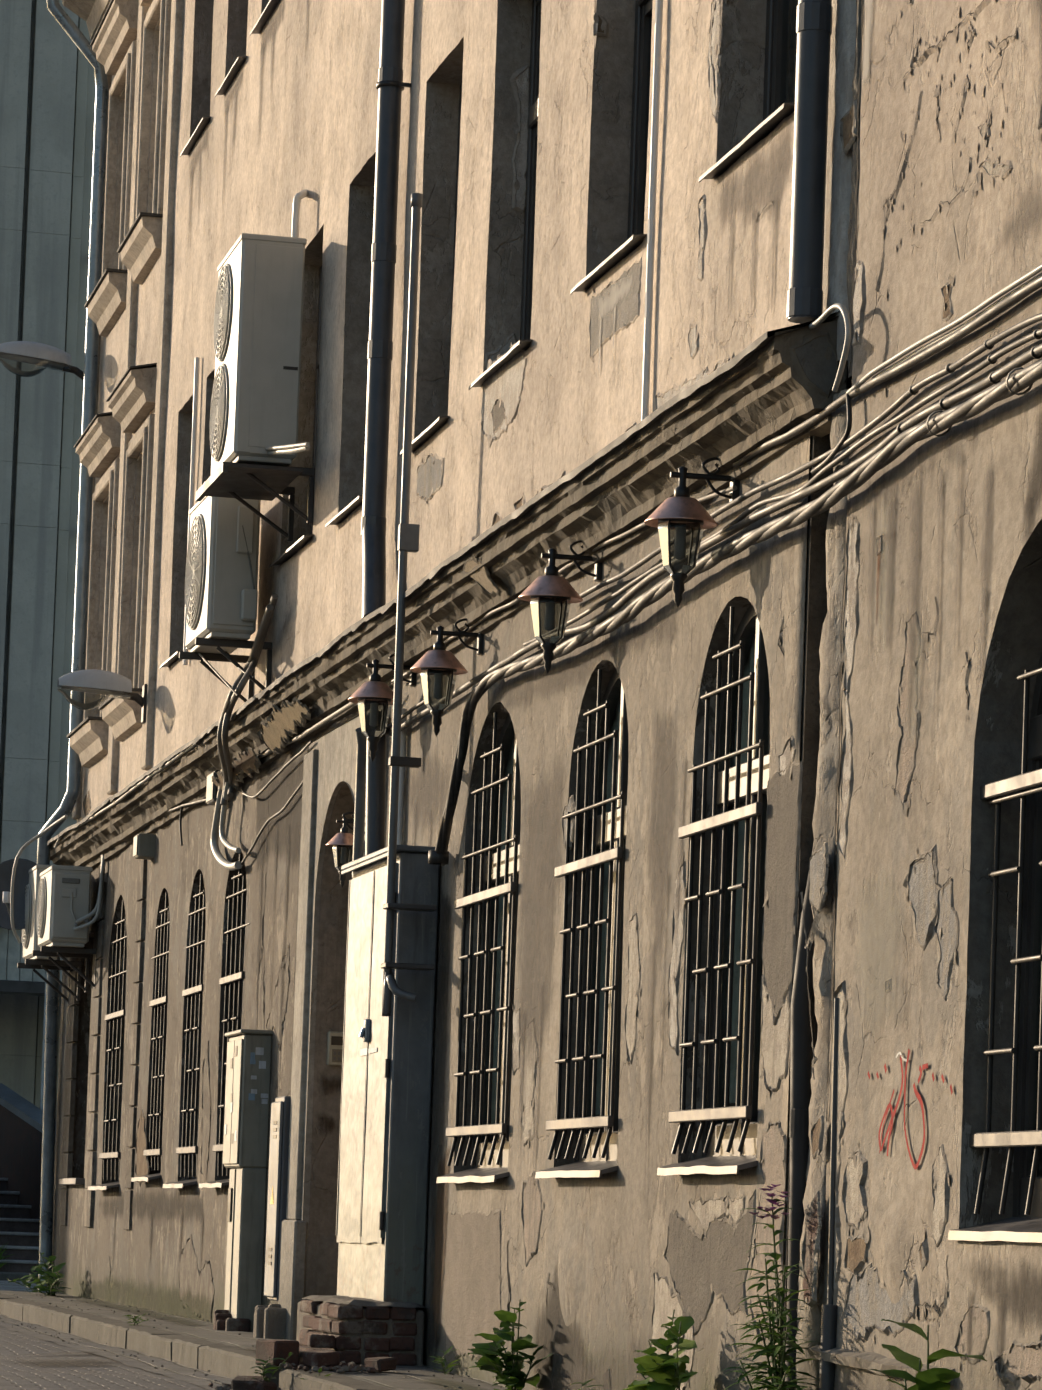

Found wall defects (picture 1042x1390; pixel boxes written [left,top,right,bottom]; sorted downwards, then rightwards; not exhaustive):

crack [1034,103,1042,142]
crack [849,0,1018,373]
flaking render [481,333,527,448]
flaking render [655,324,731,409]
flaking render [760,515,885,1100]
flaking render [905,844,960,1001]
damp [103,1194,203,1262]
flaking render [651,981,949,1390]
flaking render [954,1303,1042,1390]